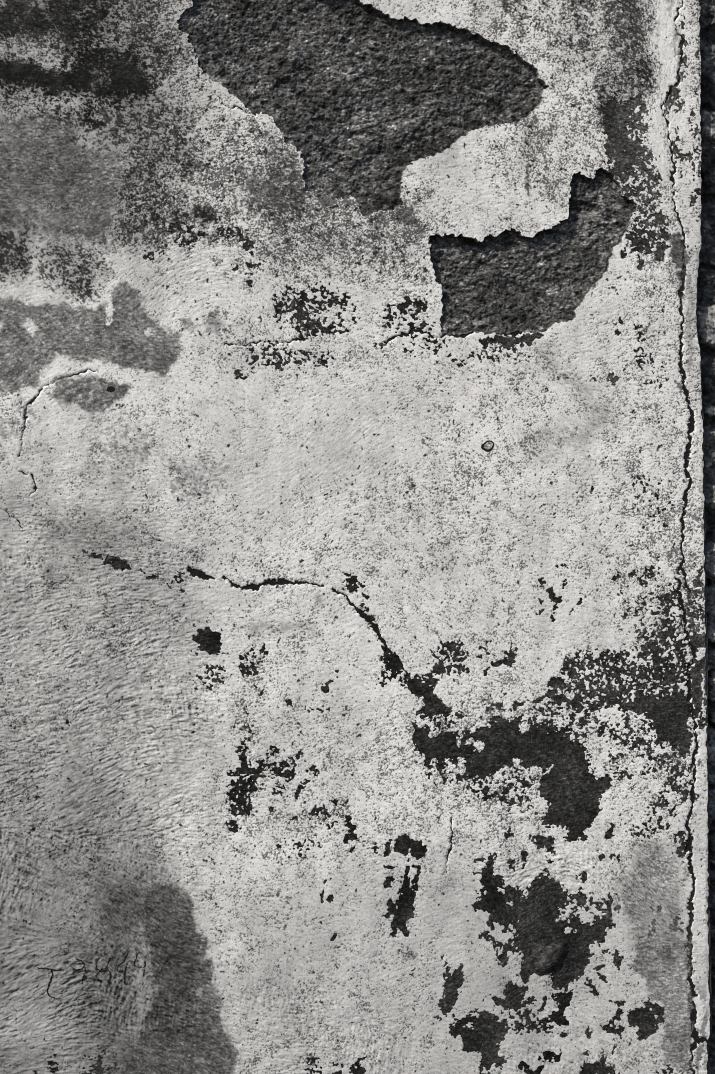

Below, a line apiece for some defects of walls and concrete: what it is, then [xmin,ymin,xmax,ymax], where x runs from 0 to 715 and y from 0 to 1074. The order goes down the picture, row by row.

water stain [0,0,423,392]
spalling [177,0,549,217]
spalling [382,16,701,367]
crack [18,369,96,493]
water stain [48,374,130,412]
peeling [234,281,361,380]
crack [661,0,715,1074]
peeling [189,621,268,696]
crack [188,566,448,714]
peeling [225,705,320,833]
peeling [371,563,708,1074]
water stain [104,883,238,1074]